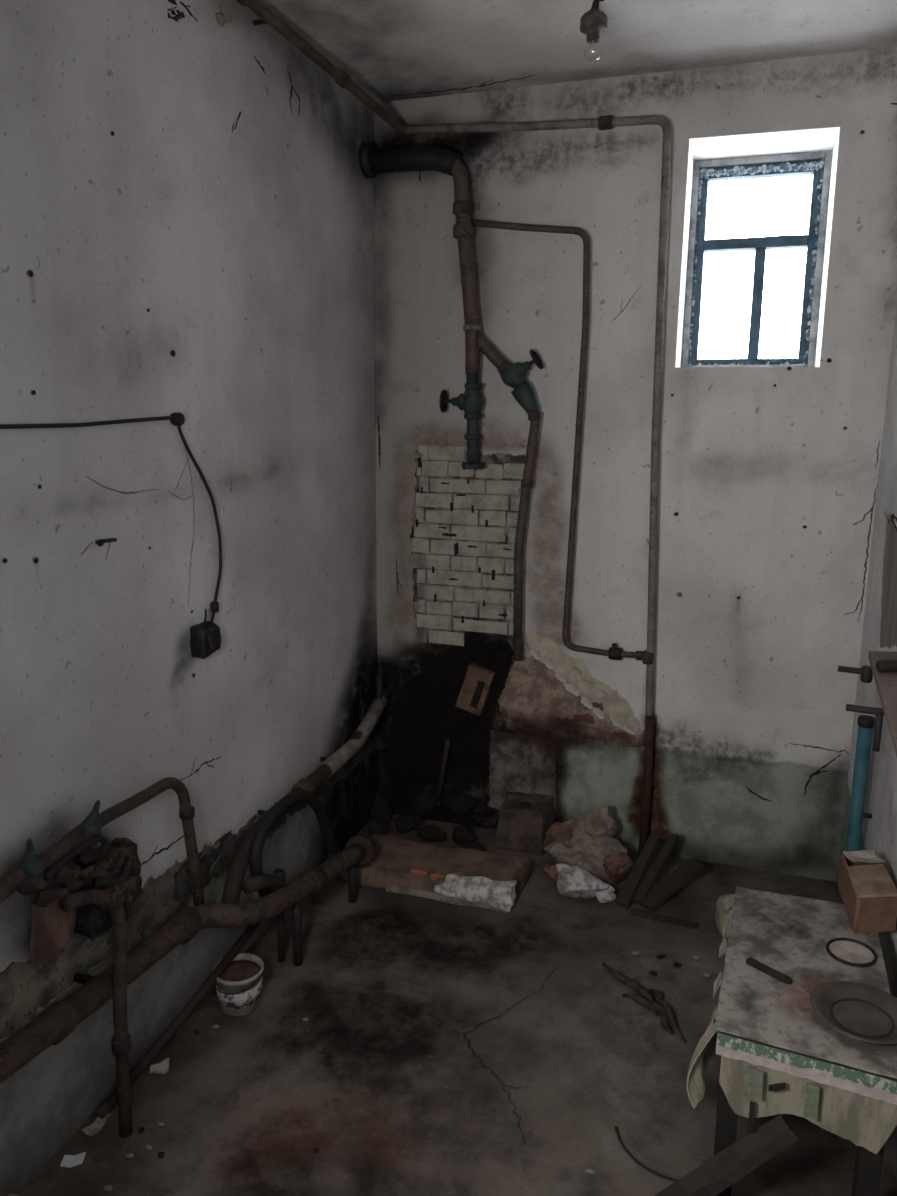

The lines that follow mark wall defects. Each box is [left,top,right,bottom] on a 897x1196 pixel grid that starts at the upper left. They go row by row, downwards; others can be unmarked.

peeling [880,510,897,649]
flaking render [266,734,379,839]
rust [629,719,669,839]
flaking render [0,814,262,1039]
crack [453,963,560,1145]